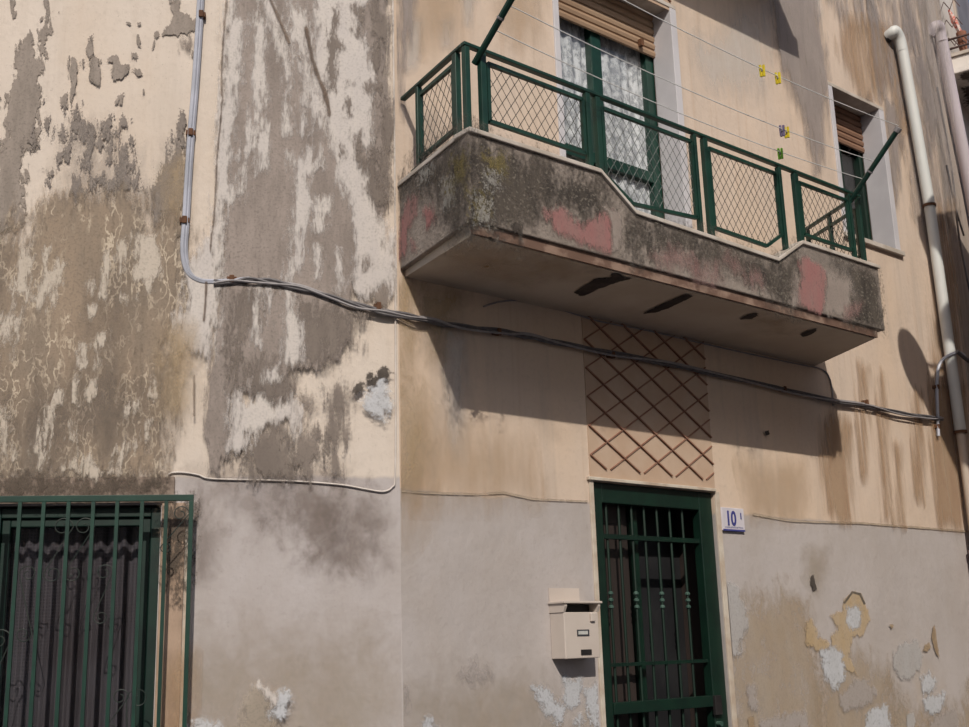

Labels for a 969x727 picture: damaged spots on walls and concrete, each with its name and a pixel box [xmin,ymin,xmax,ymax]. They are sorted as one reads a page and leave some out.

peeling [0,245,66,361]
peeling [0,0,196,319]
flaking render [172,0,436,486]
water stain [327,9,345,92]
water stain [398,116,802,320]
water stain [774,0,828,170]
water stain [831,0,969,358]
peeling [0,332,111,470]
water stain [0,184,199,607]
peeling [61,418,153,482]
water stain [912,354,968,527]
peeling [805,591,870,690]